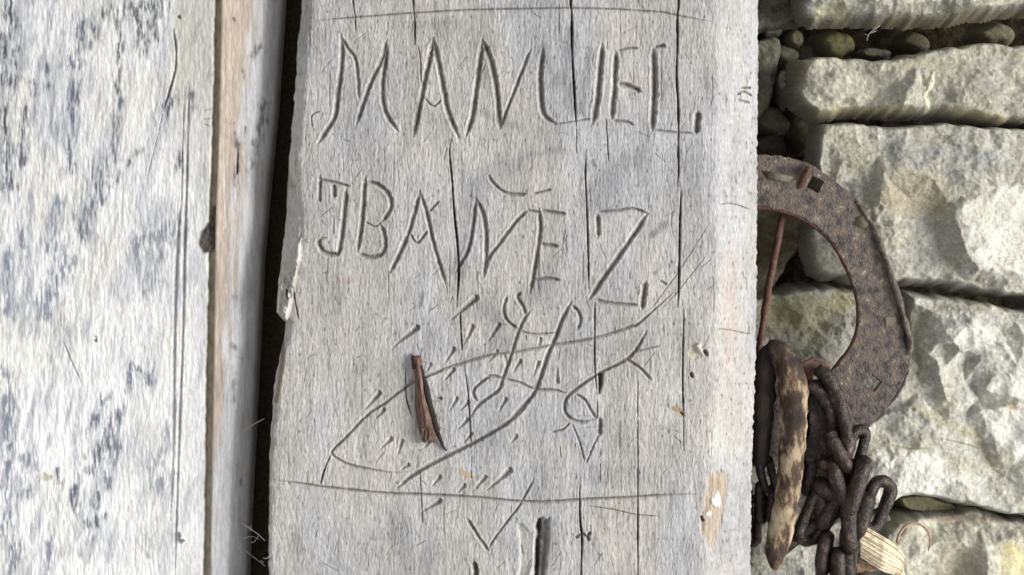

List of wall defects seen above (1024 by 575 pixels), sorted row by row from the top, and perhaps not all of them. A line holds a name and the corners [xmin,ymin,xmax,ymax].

crack [674,0,685,453]
peeling [697,469,733,556]